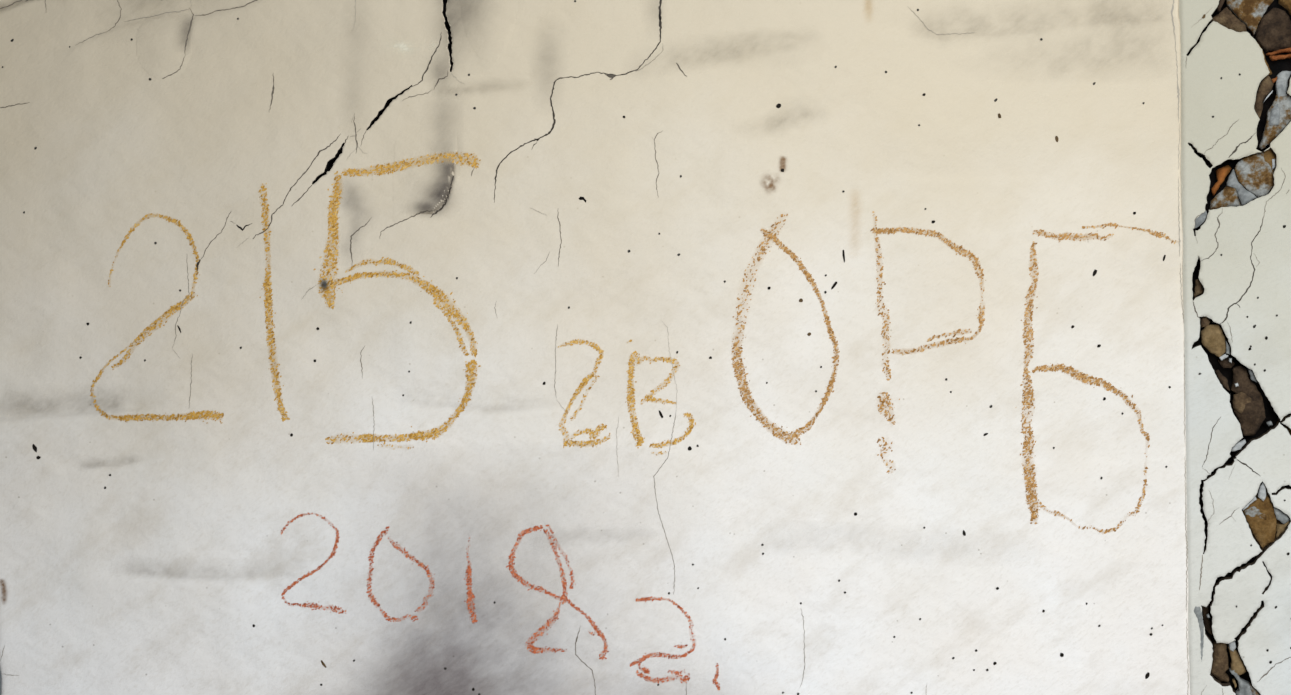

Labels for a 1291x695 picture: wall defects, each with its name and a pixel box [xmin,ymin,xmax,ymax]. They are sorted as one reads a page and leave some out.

crack [78,0,257,79]
crack [172,0,464,405]
crack [350,0,686,262]
crack [534,211,562,274]
flaking render [1192,257,1204,299]
crack [1171,0,1289,336]
flaking render [1195,0,1291,228]
flaking render [1192,316,1278,455]
crack [1184,354,1291,695]
flaking render [1242,481,1290,553]
crack [575,629,596,695]
flaking render [1194,592,1261,695]